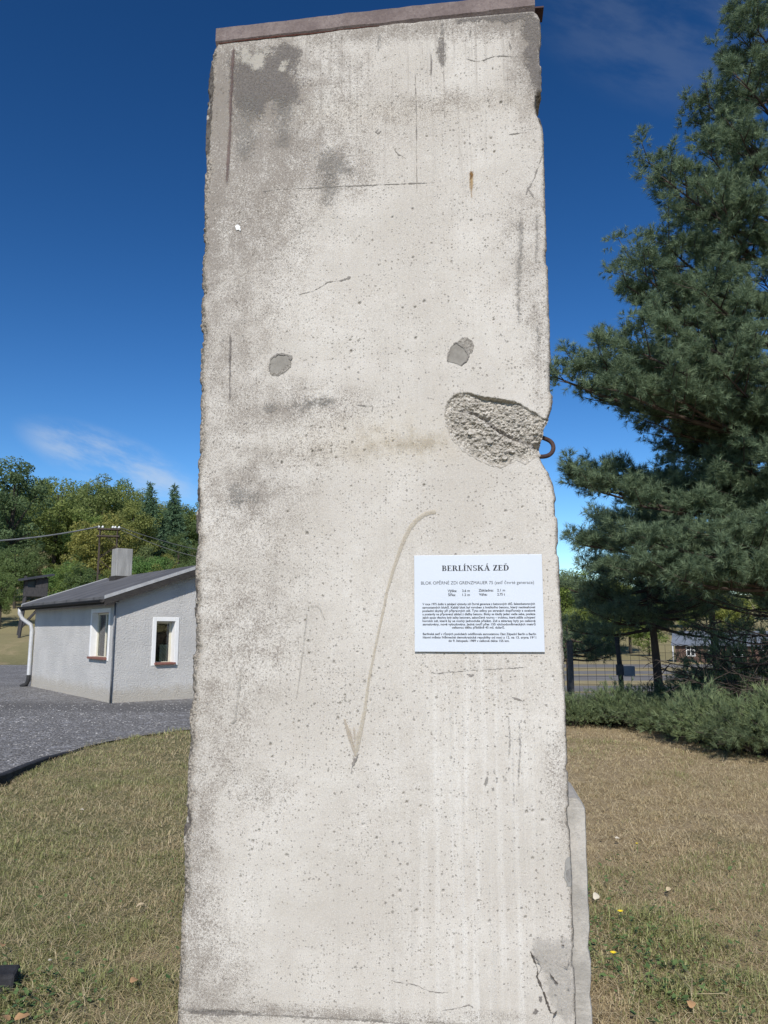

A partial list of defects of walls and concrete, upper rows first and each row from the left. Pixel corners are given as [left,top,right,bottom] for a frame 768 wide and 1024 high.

leakage [227,42,304,160]
spalling [458,337,474,354]
spalling [444,392,549,468]
crack [530,945,570,1017]